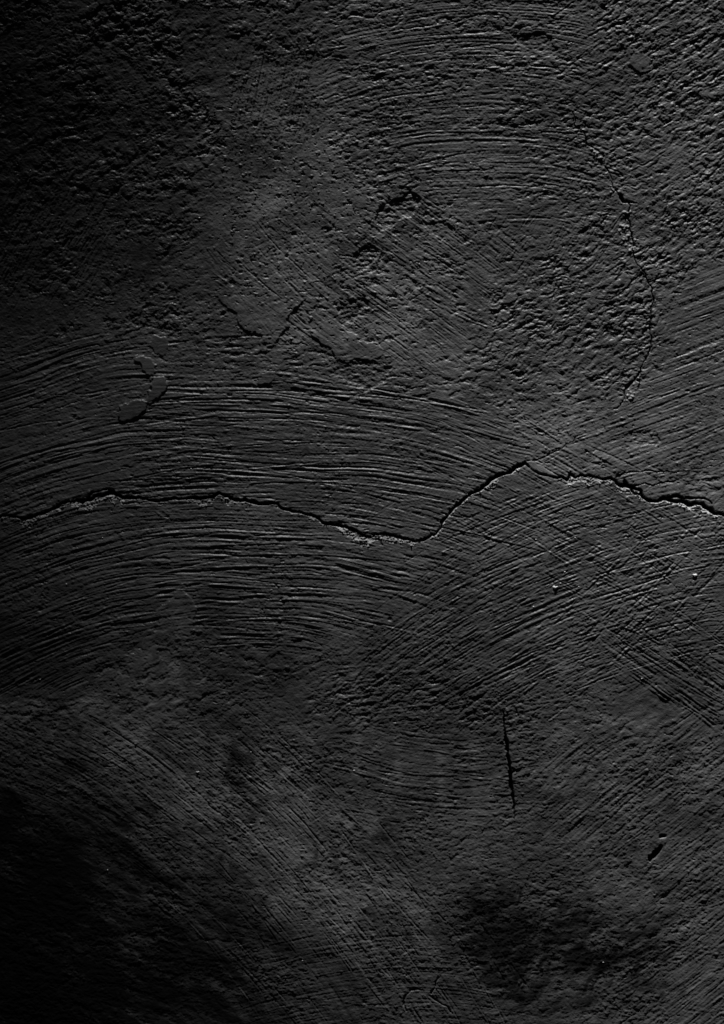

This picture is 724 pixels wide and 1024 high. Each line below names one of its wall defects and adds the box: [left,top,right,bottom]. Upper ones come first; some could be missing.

crack [571,110,697,409]
crack [0,436,724,548]